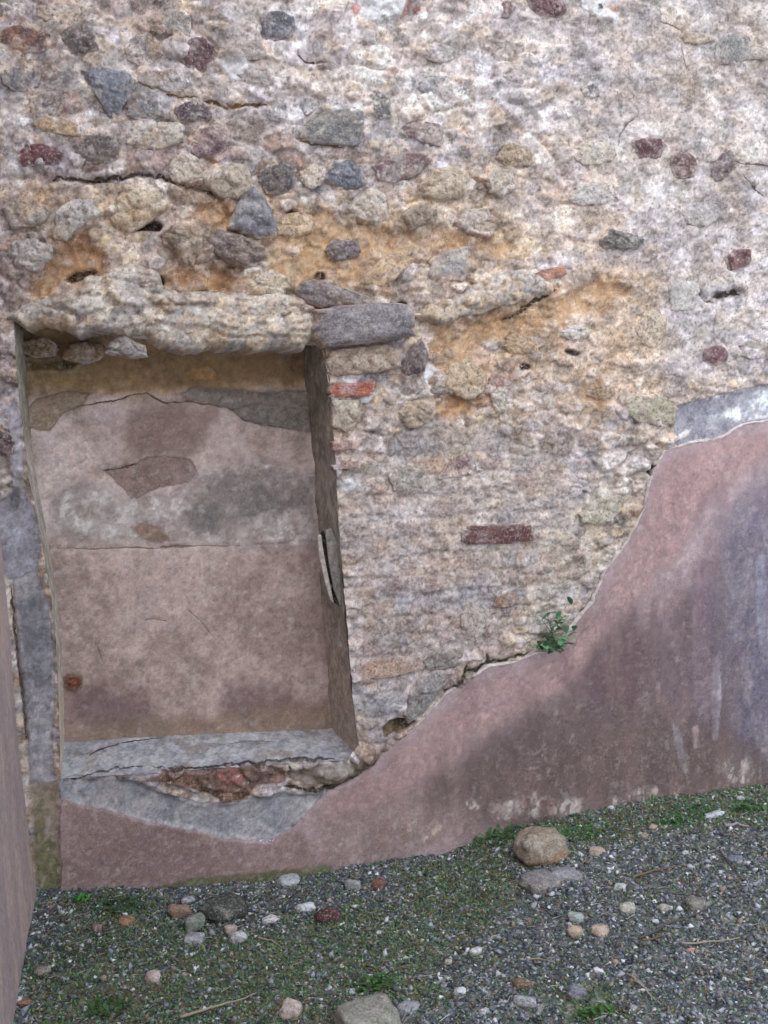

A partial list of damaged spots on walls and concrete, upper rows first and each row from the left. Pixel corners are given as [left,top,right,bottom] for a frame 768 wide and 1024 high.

crack [53,172,215,196]
spalling [666,384,768,449]
crack [61,542,283,550]
spalling [0,386,373,843]
leakage [437,484,768,824]